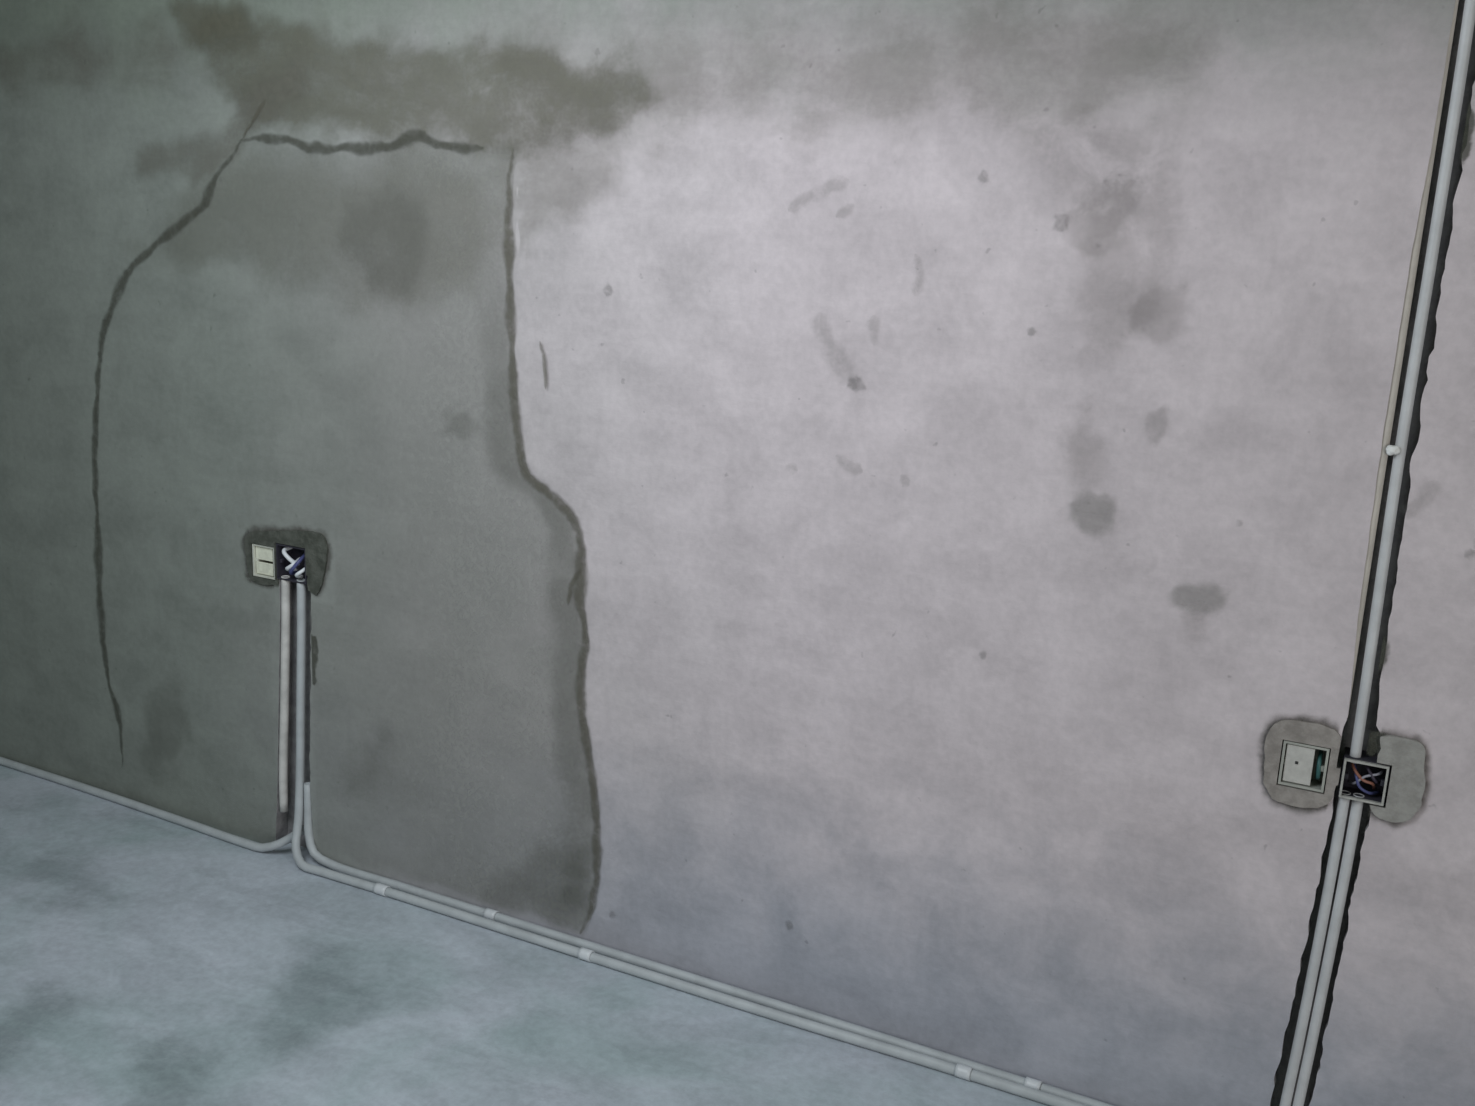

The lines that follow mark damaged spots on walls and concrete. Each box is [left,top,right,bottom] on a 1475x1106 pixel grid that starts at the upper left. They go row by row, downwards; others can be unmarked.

crack [92,104,470,745]
crack [504,149,622,945]